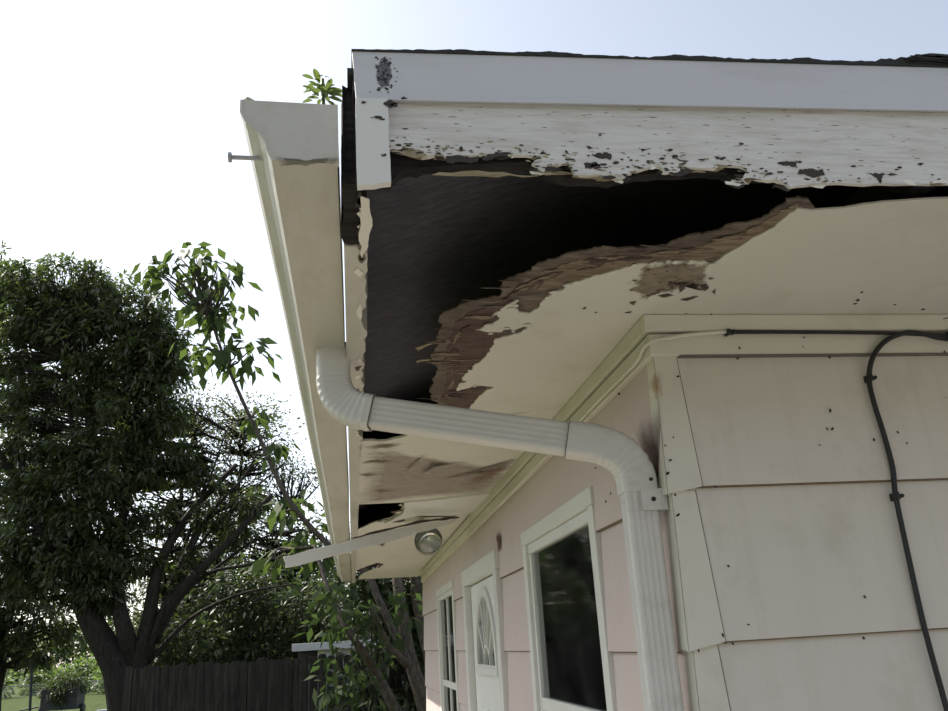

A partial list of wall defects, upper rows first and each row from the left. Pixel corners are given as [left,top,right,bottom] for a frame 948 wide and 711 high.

peeling [371,96,407,120]
peeling [381,128,916,192]